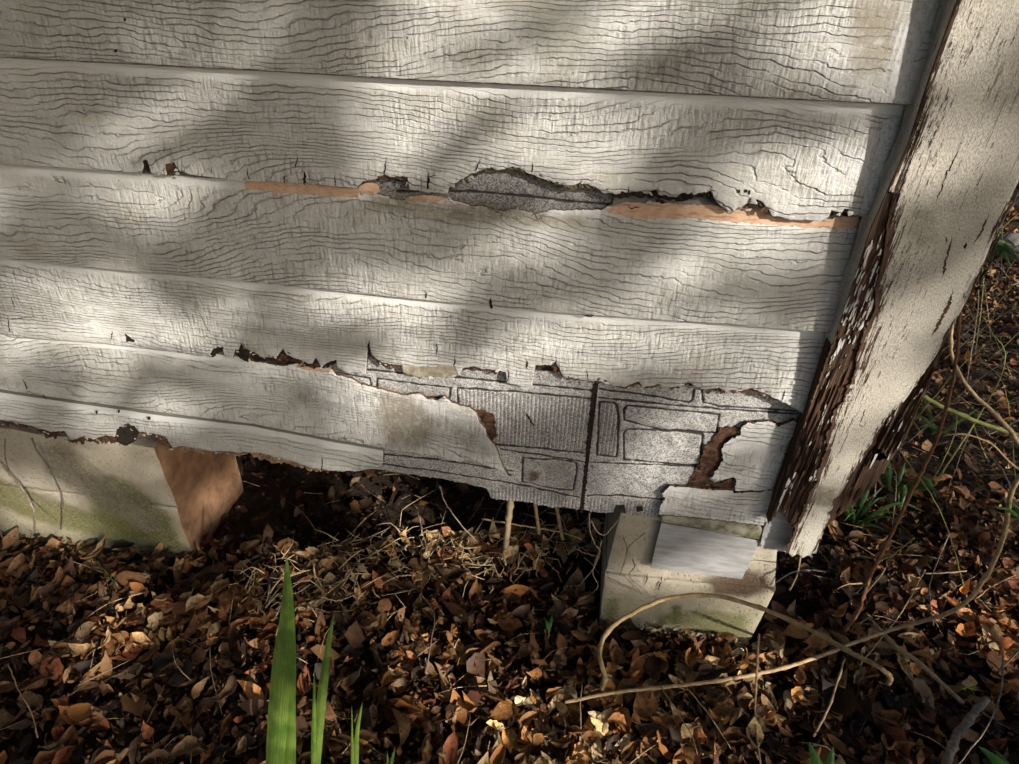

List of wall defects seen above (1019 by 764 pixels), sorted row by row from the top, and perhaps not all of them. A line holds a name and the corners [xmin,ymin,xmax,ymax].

peeling [244,174,391,198]
peeling [406,182,528,219]
peeling [605,0,994,529]
peeling [961,227,1002,300]
peeling [236,351,331,374]
peeling [380,363,482,379]
crack [580,371,597,513]